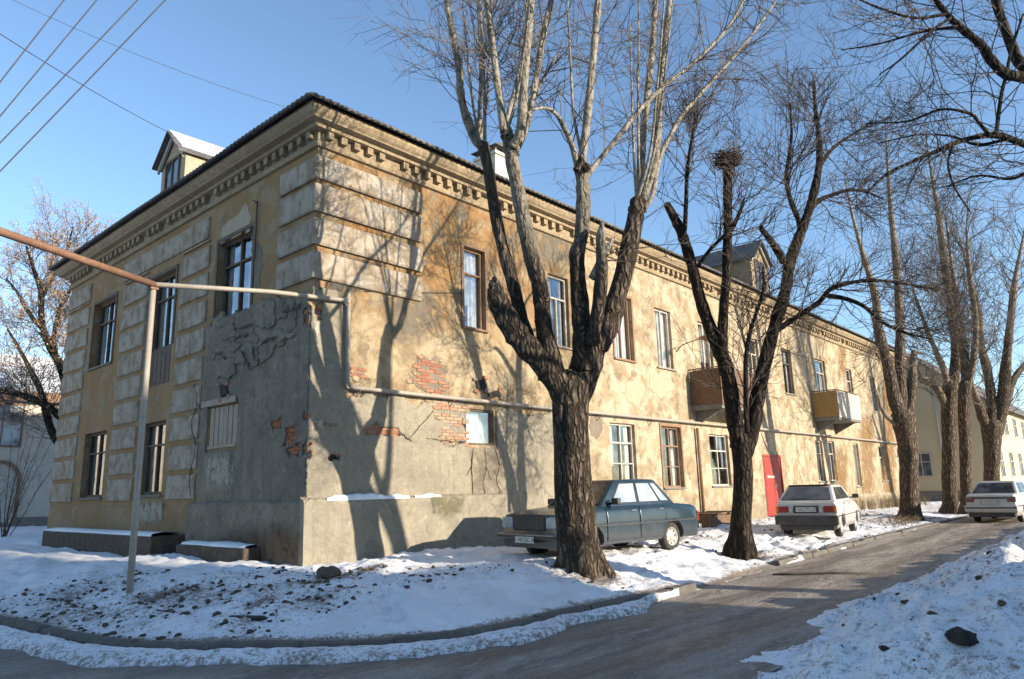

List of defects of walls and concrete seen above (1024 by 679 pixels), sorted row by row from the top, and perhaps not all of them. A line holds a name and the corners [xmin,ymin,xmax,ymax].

spalling [350,367,372,382]
spalling [406,354,470,447]
spalling [272,411,325,460]
spalling [361,422,401,437]